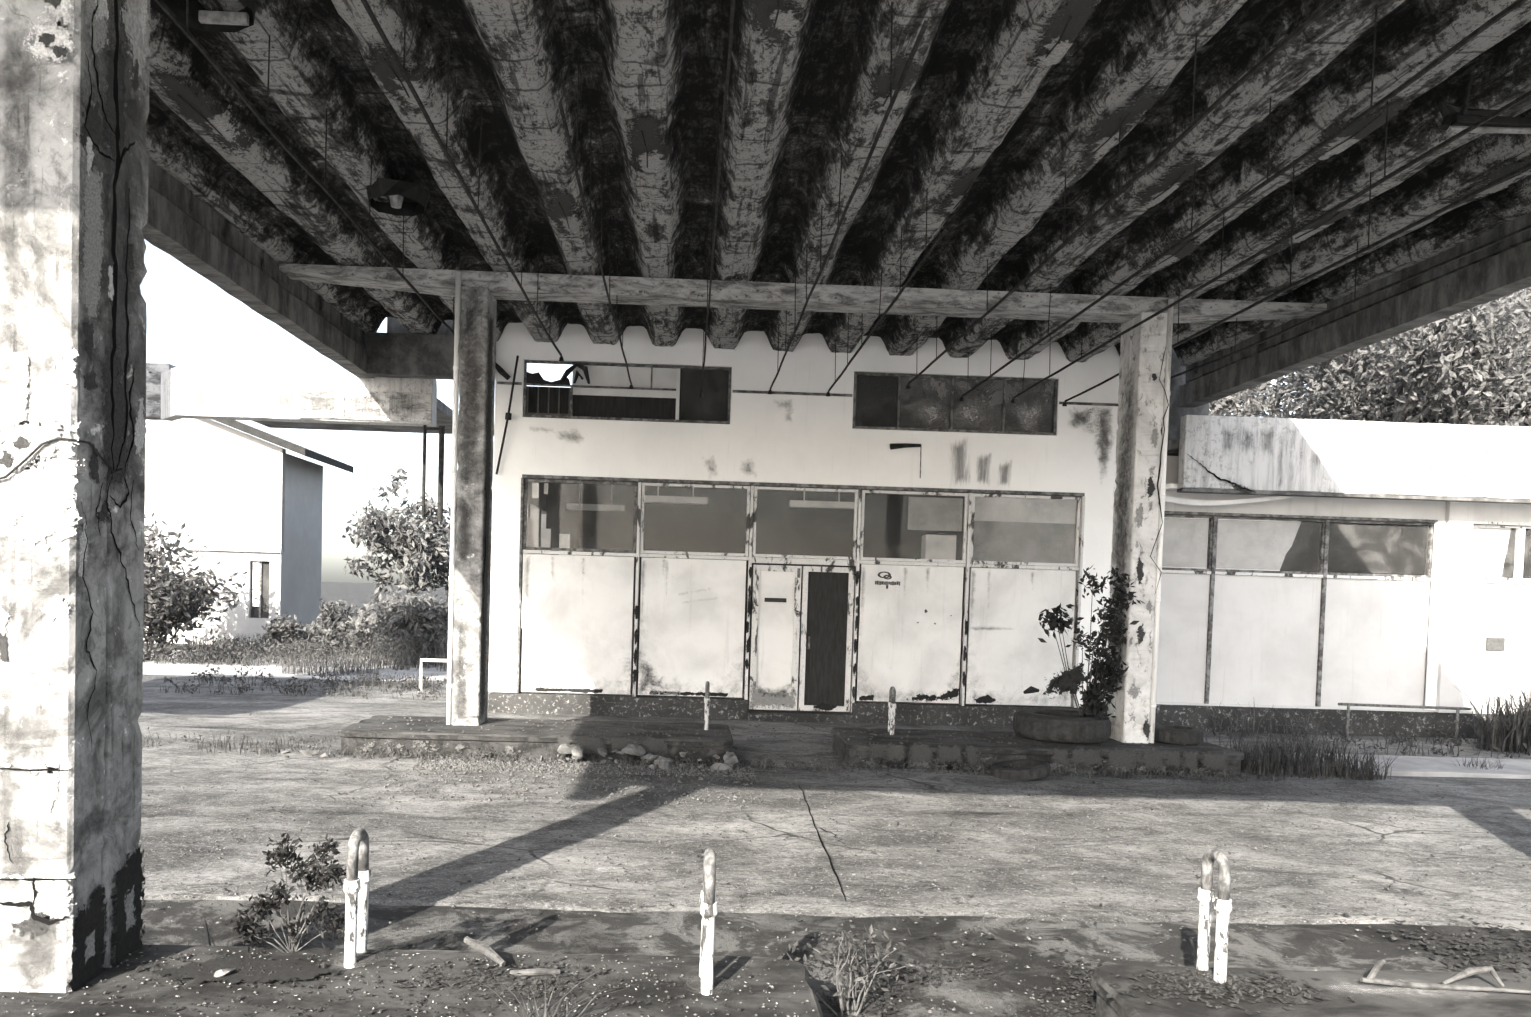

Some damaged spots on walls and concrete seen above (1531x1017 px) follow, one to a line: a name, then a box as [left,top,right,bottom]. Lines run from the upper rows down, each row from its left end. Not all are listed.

spalling [53,137,134,393]
peeling [0,352,110,577]
crack [76,0,140,744]
spalling [134,398,148,457]
crack [1187,454,1256,494]
peeling [28,872,76,921]
crack [799,785,846,901]